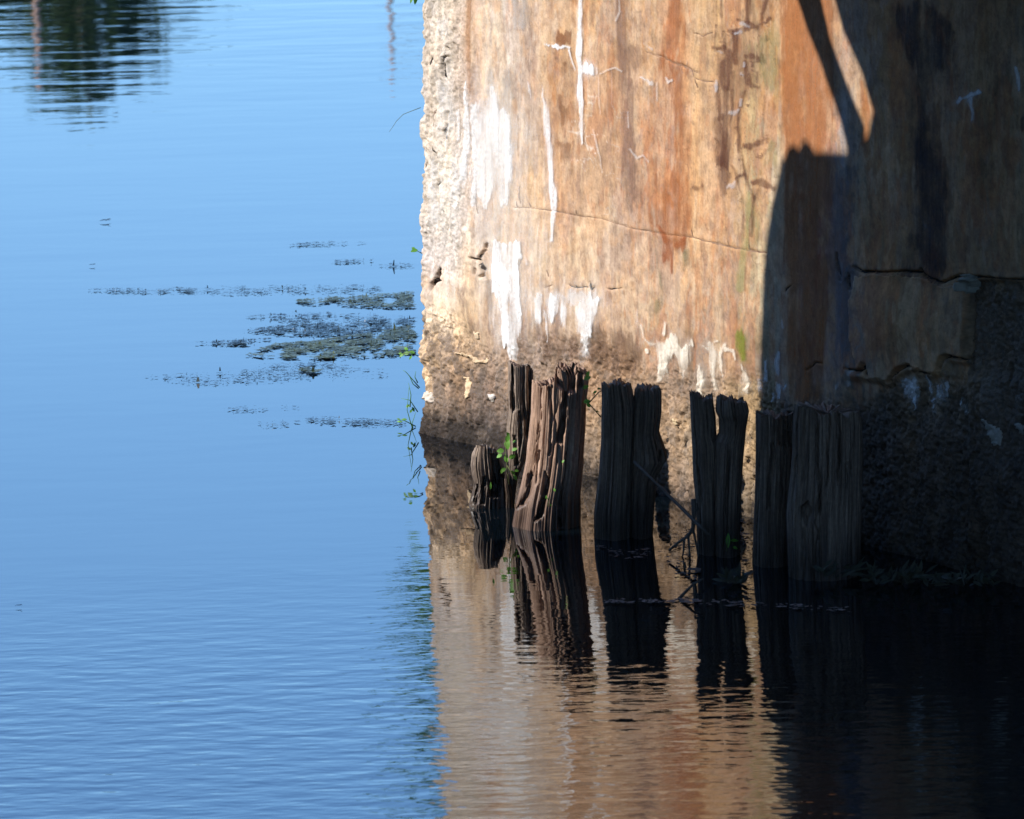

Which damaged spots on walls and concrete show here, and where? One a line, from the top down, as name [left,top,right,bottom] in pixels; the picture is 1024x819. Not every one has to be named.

efflorescence [458,82,511,208]
efflorescence [544,104,557,241]
crack [515,193,767,253]
rust [659,173,685,273]
leakage [487,240,522,359]
leakage [535,292,599,354]
leakage [631,325,693,380]
efflorescence [696,344,735,394]
crack [838,262,1024,287]